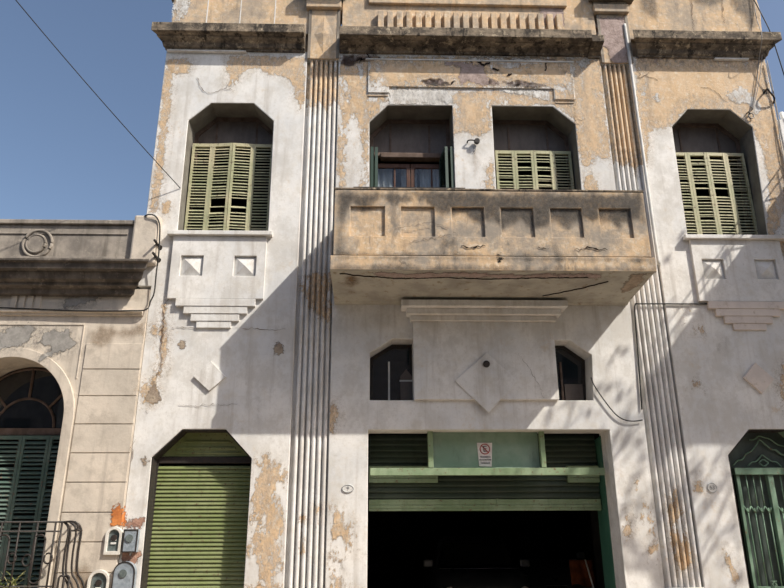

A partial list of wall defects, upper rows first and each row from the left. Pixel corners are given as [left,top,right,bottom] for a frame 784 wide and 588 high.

peeling [149,58,193,214]
peeling [226,16,784,235]
crack [340,273,608,297]
spalling [372,271,601,279]
peeling [138,304,186,406]
rust [110,502,127,527]
peeling [247,452,288,588]
peeling [315,505,357,588]
peeling [667,489,692,571]
peeling [722,548,739,584]